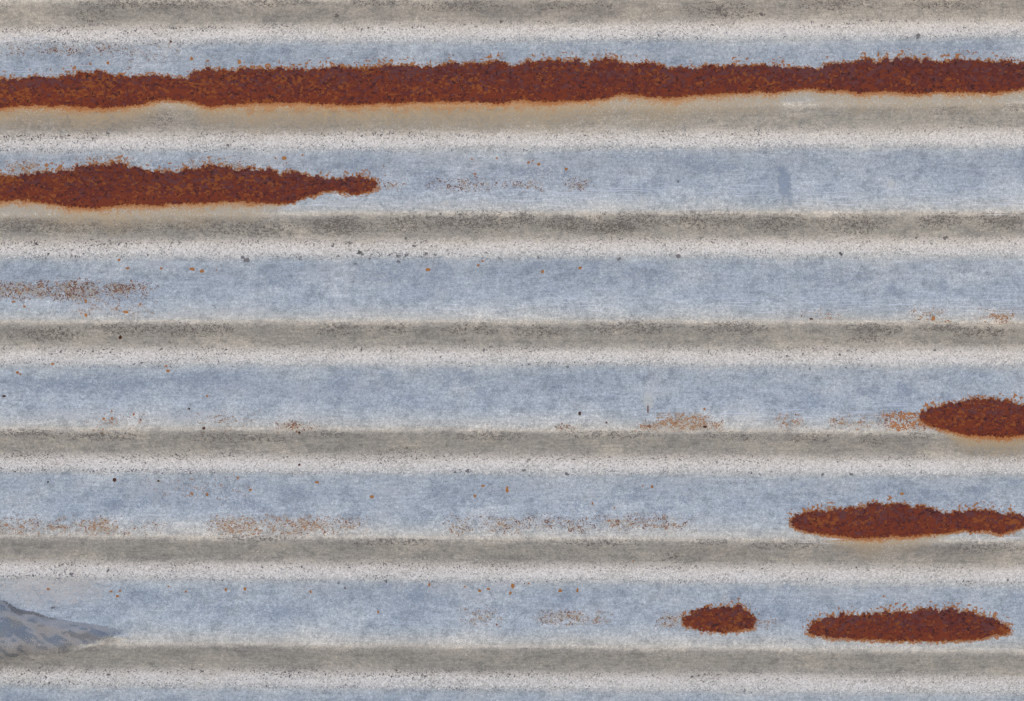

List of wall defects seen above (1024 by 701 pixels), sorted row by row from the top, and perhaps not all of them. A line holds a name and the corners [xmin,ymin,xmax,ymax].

corrosion [0,41,1024,113]
corrosion [0,155,405,212]
corrosion [827,392,1024,442]
corrosion [785,492,1024,543]
corrosion [653,598,780,636]
corrosion [802,595,1014,645]